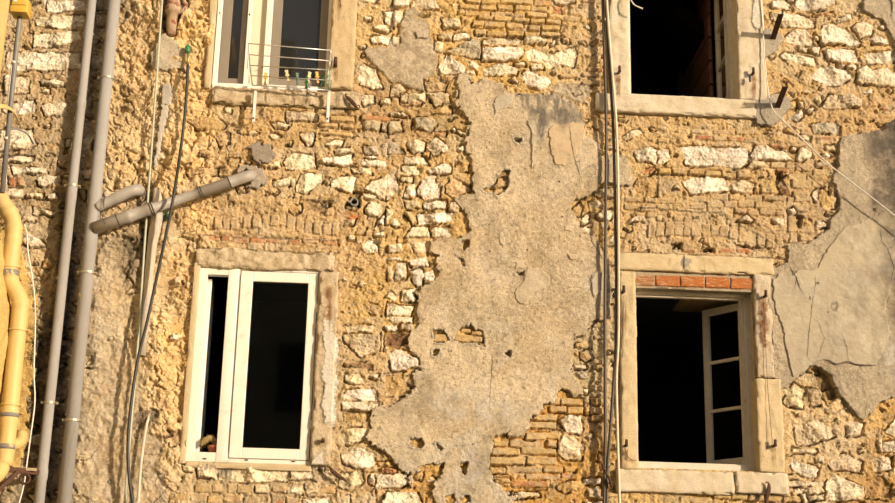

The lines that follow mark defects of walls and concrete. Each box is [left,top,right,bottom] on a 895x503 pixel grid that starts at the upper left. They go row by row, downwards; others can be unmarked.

flaking render [862,0,895,49]
damp [521,94,583,132]
flaking render [365,73,632,503]
flaking render [623,121,895,422]
corrosion [759,302,769,347]
crack [790,268,879,370]
spalling [665,493,794,503]